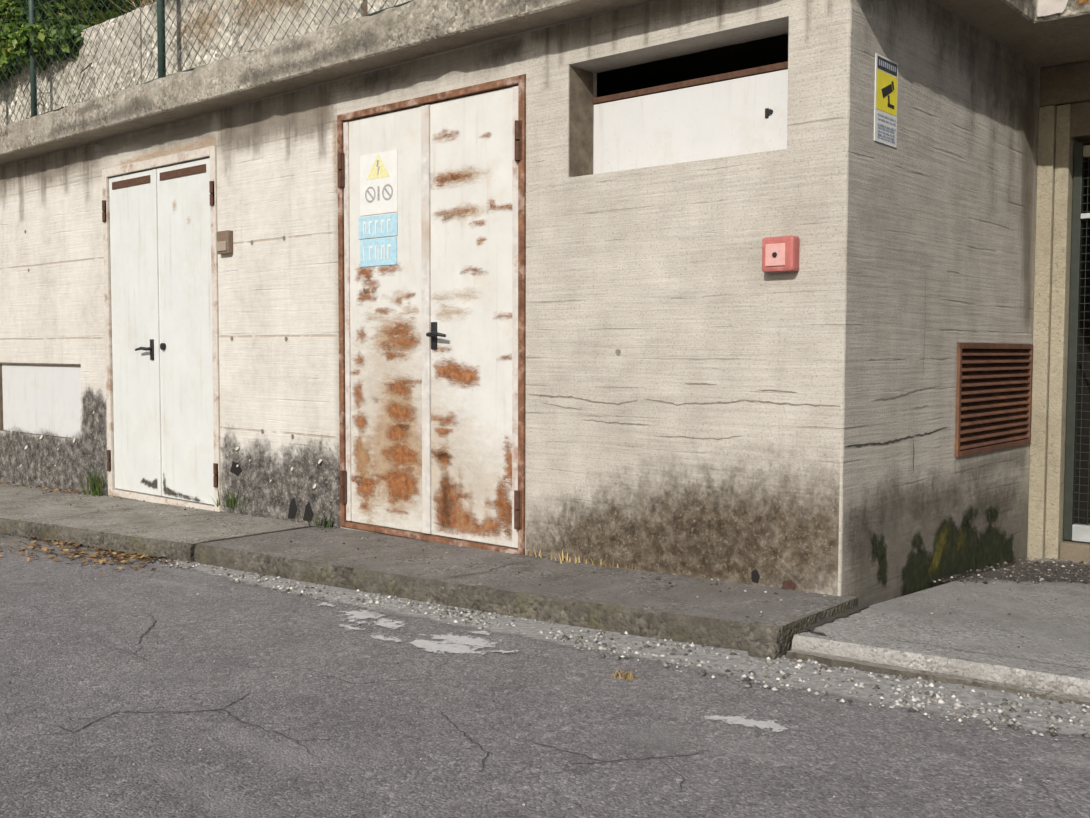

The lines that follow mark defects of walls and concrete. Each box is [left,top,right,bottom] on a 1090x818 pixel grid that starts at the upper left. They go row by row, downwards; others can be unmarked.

corrosion [437,171,474,186]
corrosion [358,264,419,360]
corrosion [351,357,512,535]
corrosion [435,347,478,387]
crack [530,383,838,440]
crack [845,280,947,471]
damp [526,479,839,591]
damp [855,497,1028,607]